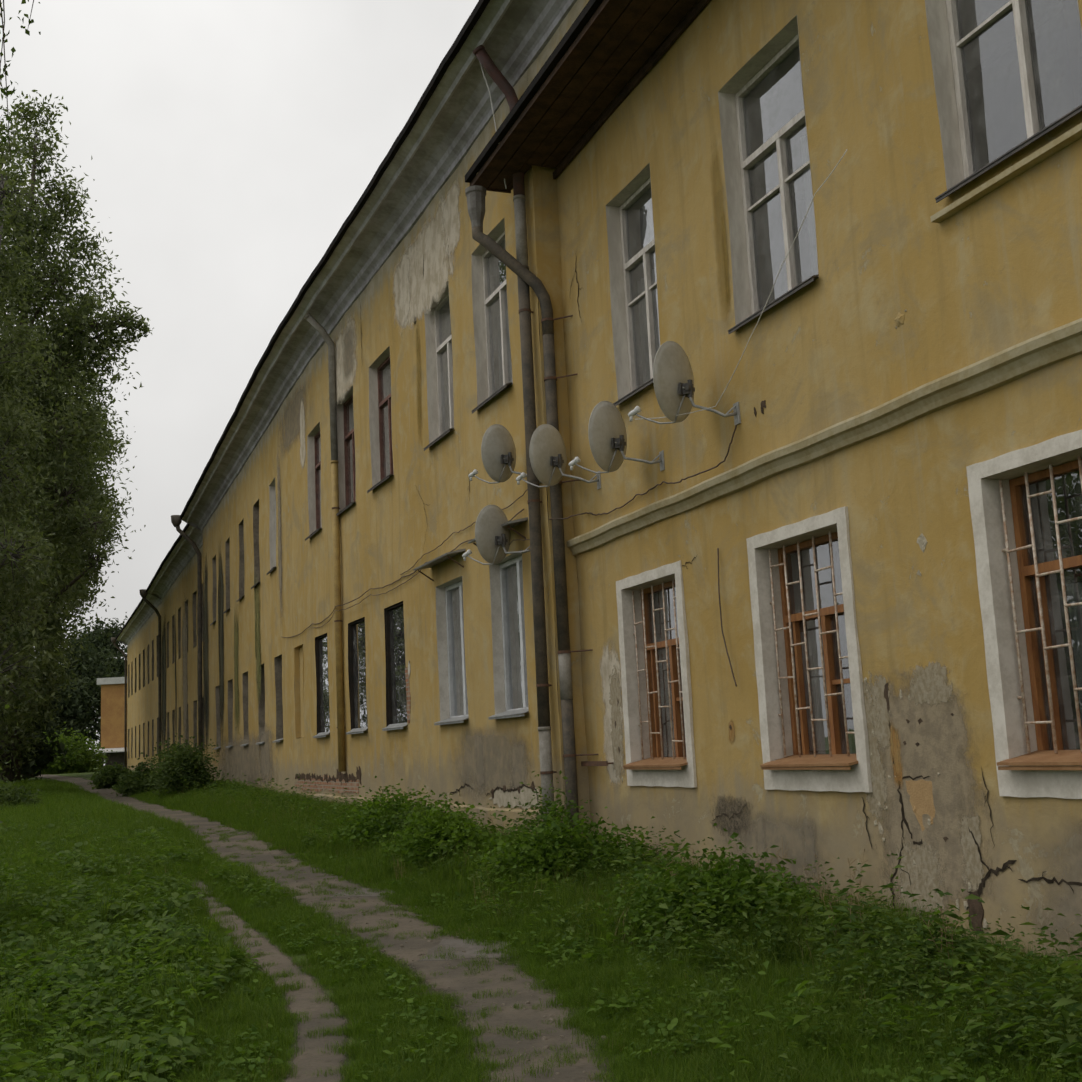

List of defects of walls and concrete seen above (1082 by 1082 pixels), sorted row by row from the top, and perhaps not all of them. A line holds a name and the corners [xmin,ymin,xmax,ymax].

flaking render [295,766,362,794]
flaking render [485,782,541,809]
leakage [712,797,816,887]
crack [862,798,872,848]
crack [889,721,923,906]
flaking render [862,662,984,917]
crack [968,768,1082,896]